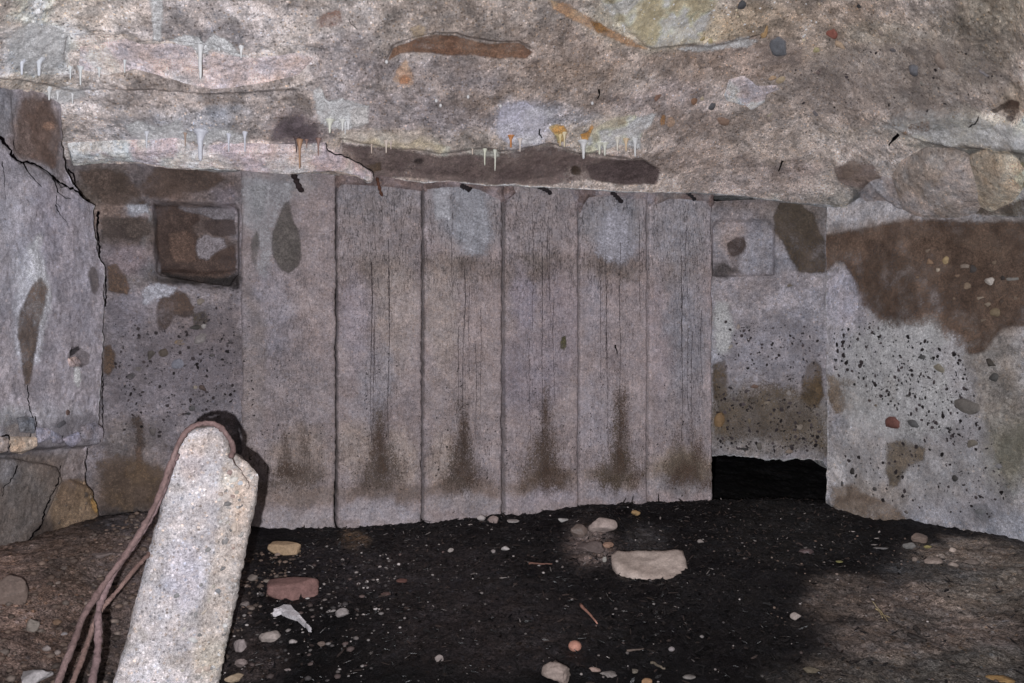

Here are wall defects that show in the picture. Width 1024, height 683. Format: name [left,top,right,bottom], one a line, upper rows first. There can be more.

crack [0,136,107,307]
water stain [8,23,103,168]
water stain [80,121,248,330]
water stain [242,180,301,275]
crack [325,143,374,176]
water stain [274,87,659,253]
water stain [14,237,51,384]
water stain [774,182,1024,487]
water stain [354,410,404,489]
water stain [444,402,487,494]
water stain [520,387,569,493]
water stain [595,384,646,494]